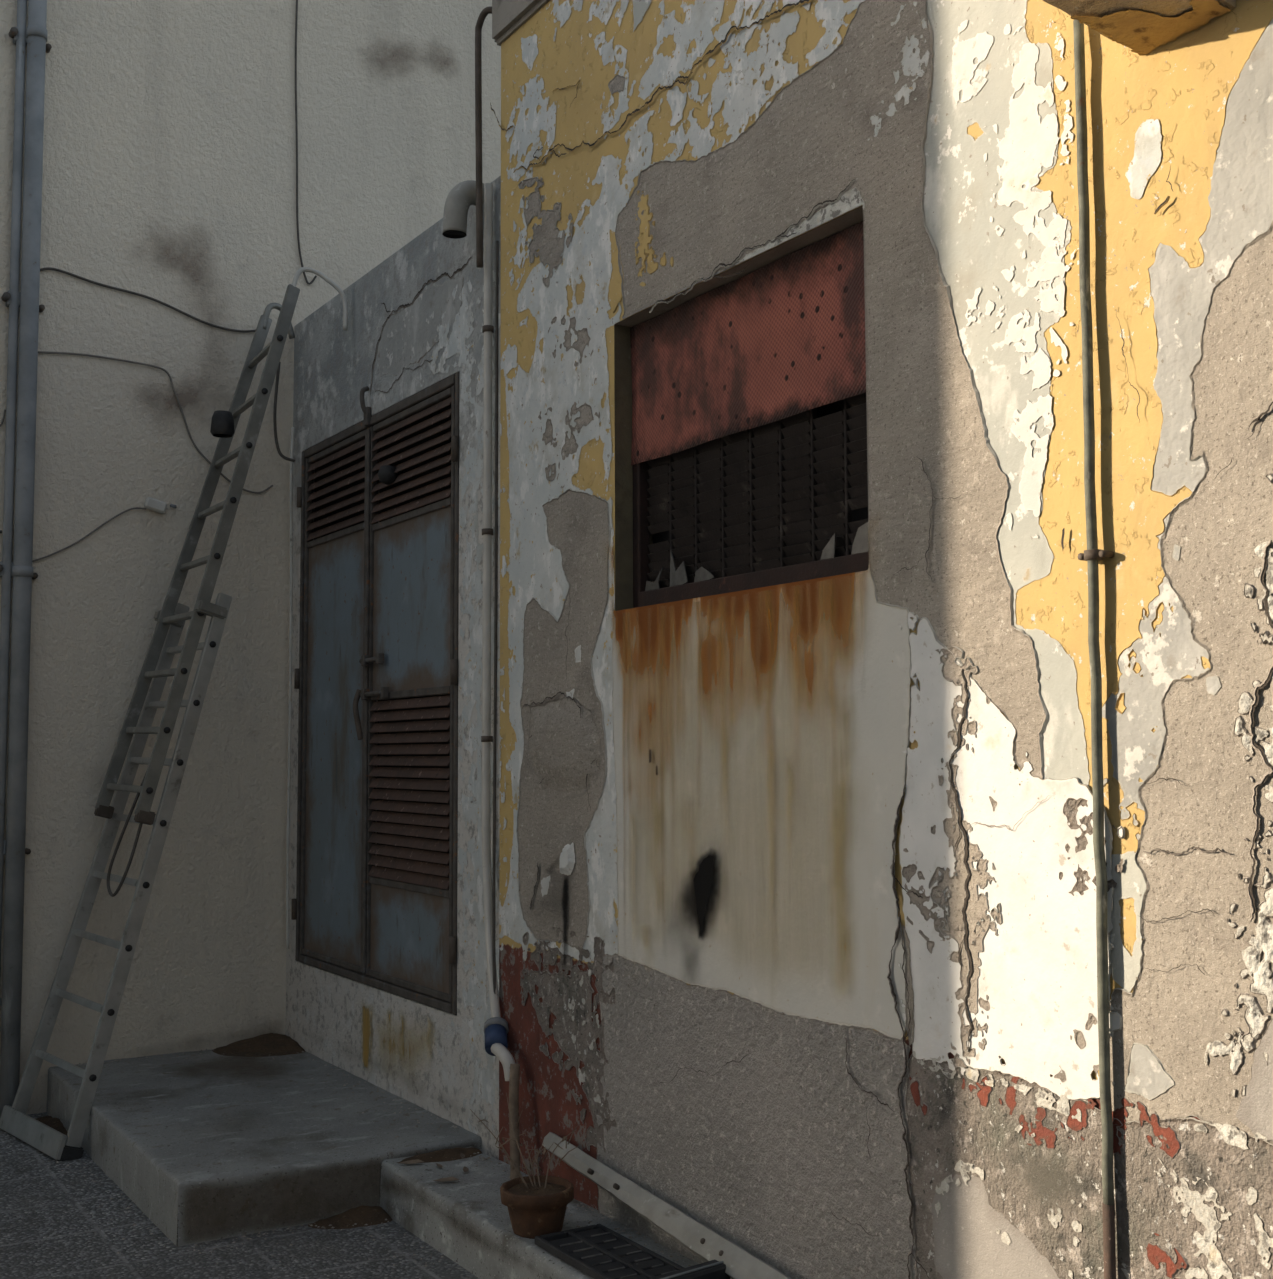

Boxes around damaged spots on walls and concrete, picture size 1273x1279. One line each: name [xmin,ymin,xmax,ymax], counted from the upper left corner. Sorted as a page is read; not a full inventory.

crack [490,102,514,132]
crack [513,0,811,173]
crack [370,257,471,393]
crack [1215,401,1273,478]
corrosion [613,572,857,747]
flaking render [380,0,1273,1279]
crack [1259,540,1273,629]
crack [1140,663,1273,923]